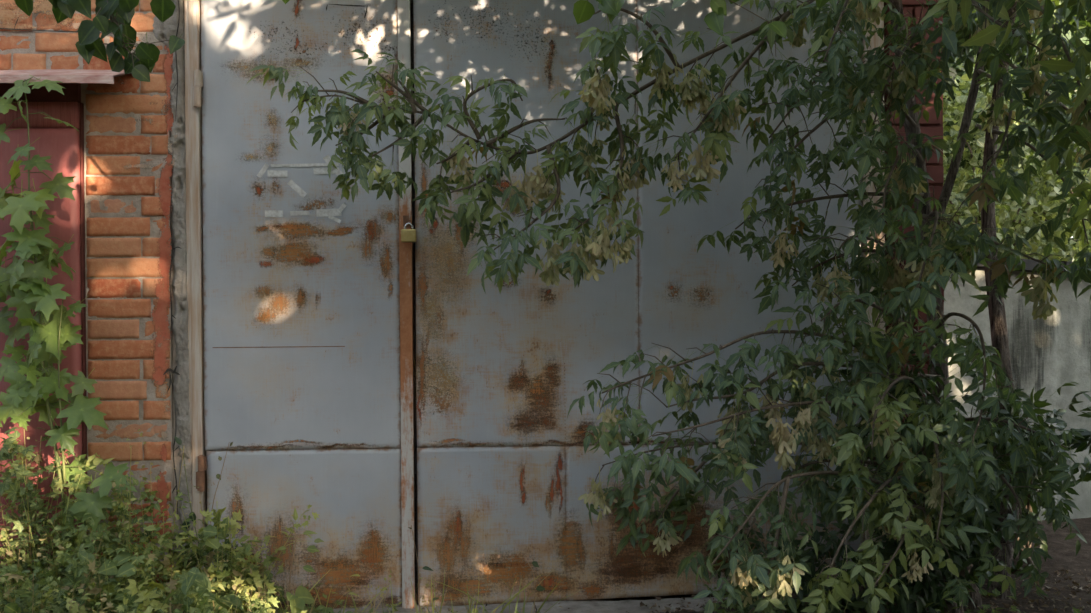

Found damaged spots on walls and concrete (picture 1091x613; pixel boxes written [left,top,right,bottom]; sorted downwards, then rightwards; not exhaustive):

rust [428,0,555,88]
rust [257,212,396,296]
rust [256,287,318,322]
rust [509,364,596,513]
rust [232,522,398,608]
rust [437,497,742,601]